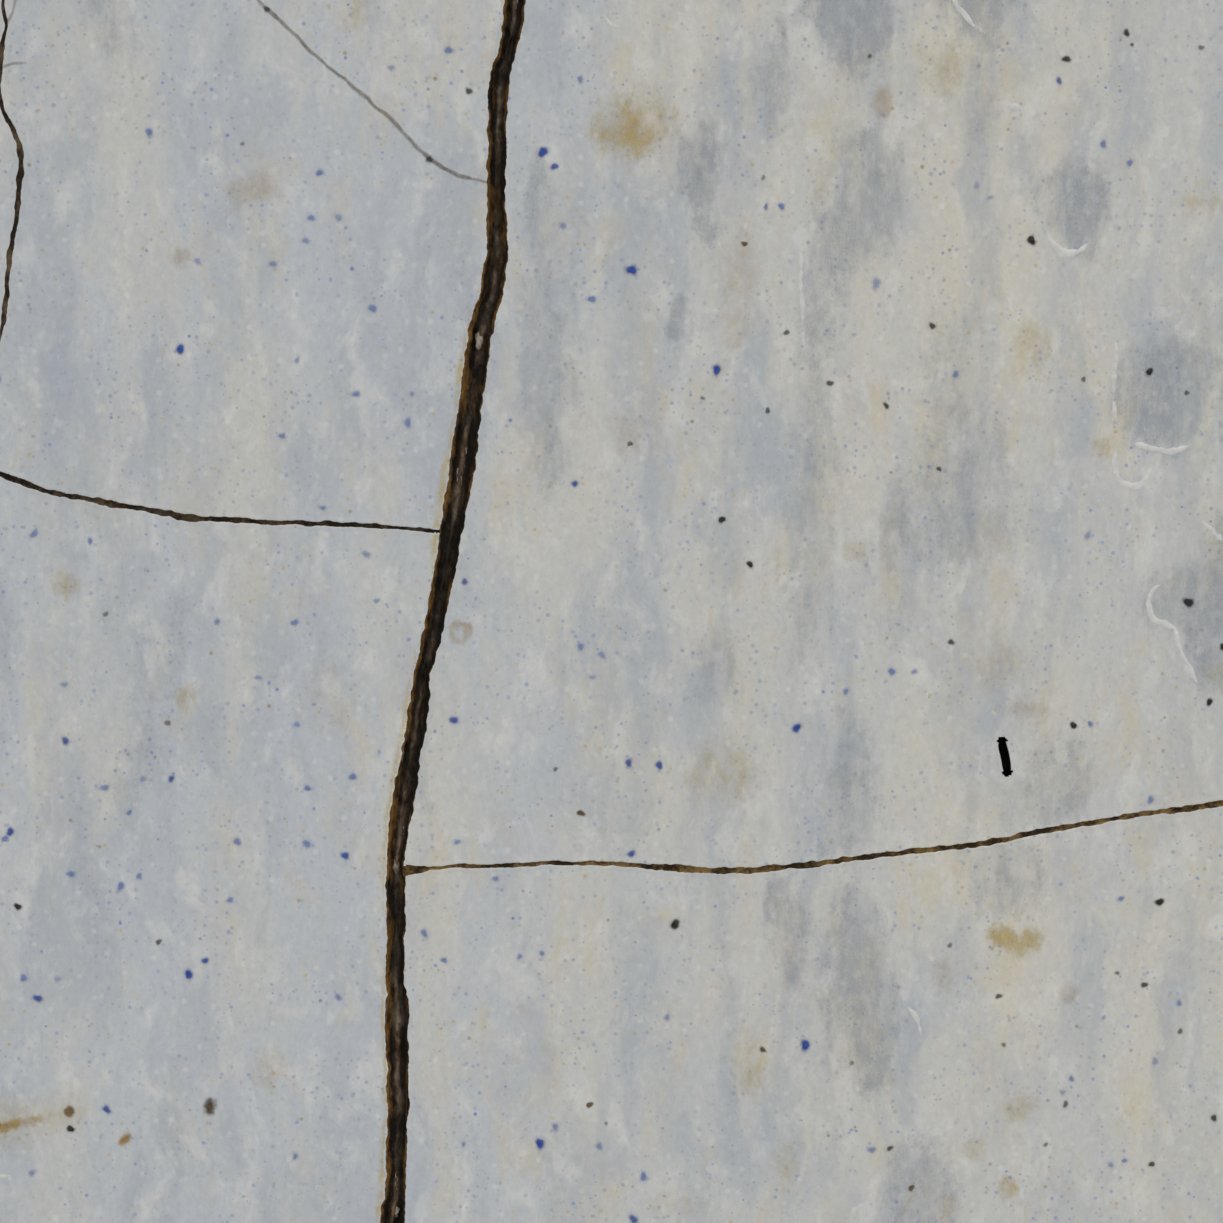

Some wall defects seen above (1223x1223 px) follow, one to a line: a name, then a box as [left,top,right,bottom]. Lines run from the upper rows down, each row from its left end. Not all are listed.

crack [0,0,29,359]
crack [302,43,409,139]
crack [0,467,441,536]
crack [376,0,1223,1223]